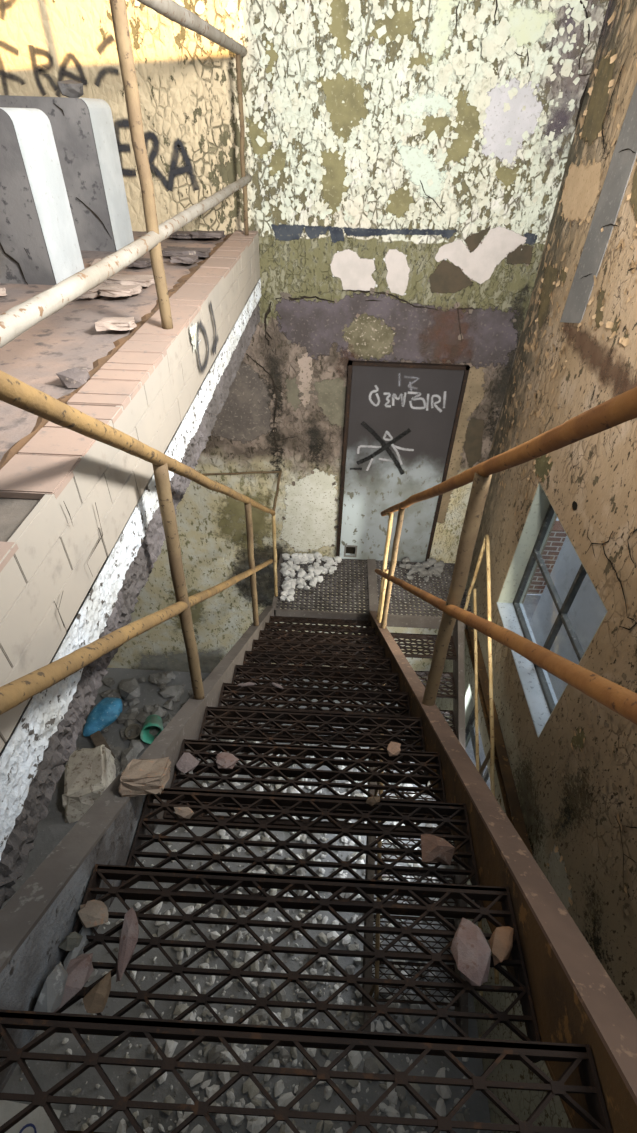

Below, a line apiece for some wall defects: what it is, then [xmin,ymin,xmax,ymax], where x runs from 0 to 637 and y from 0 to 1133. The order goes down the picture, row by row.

peeling [174,0,205,15]
crack [0,243,29,285]
peeling [190,322,201,352]
water stain [267,358,284,471]
water stain [304,417,326,469]
water stain [216,493,272,549]
crack [585,527,637,630]